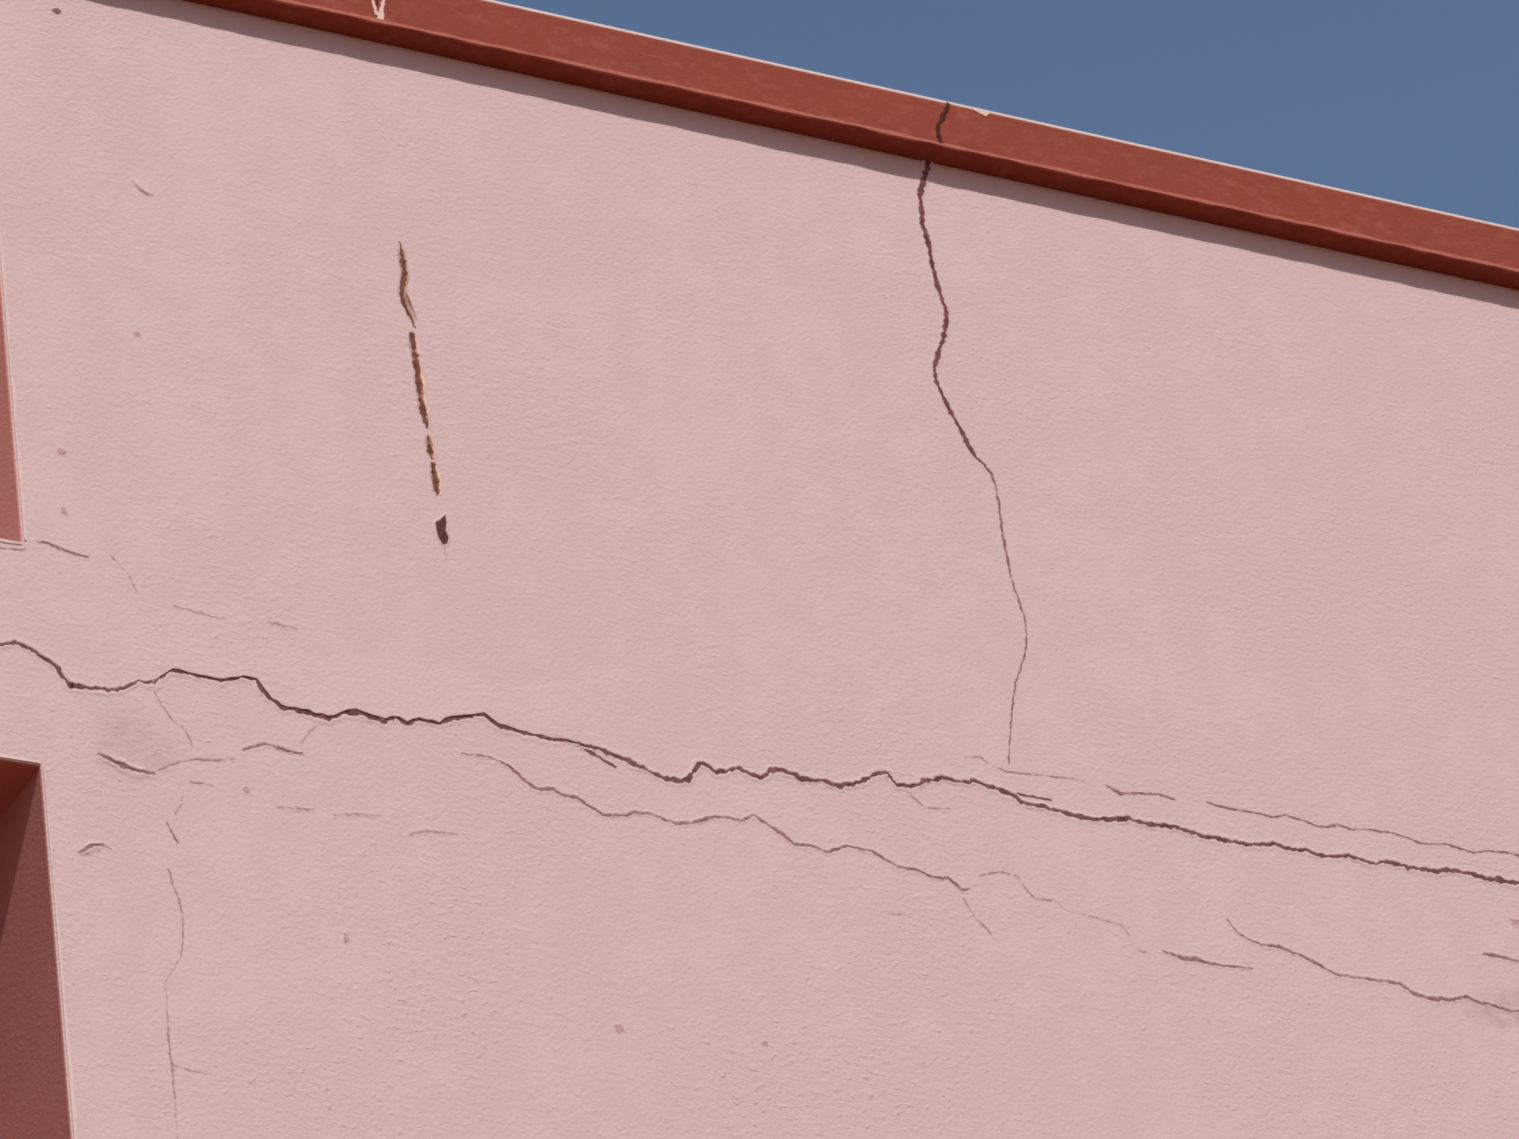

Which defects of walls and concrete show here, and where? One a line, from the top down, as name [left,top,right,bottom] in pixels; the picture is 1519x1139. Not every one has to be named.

crack [0,102,1519,933]
crack [165,796,205,1116]
crack [1083,914,1519,1015]